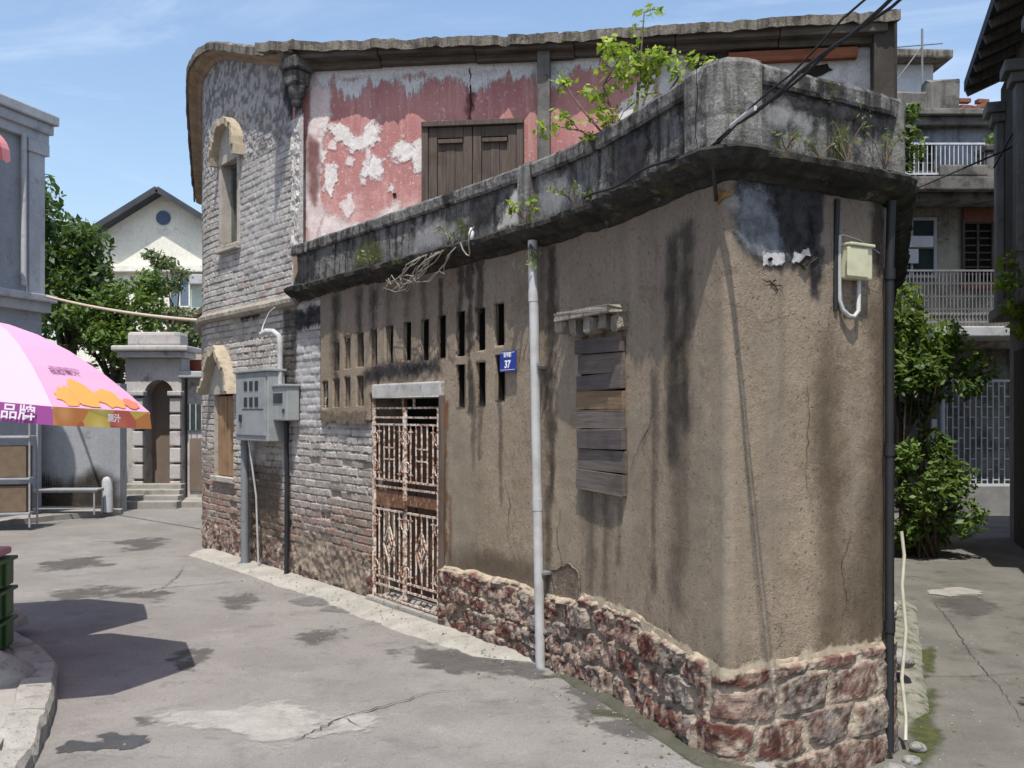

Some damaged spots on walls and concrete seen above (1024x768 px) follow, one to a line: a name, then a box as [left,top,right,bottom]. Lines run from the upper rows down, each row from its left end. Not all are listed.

crack [467,68,475,120]
peeling [551,40,706,122]
peeling [303,62,537,241]
water stain [415,222,457,251]
water stain [470,191,518,230]
water stain [541,179,583,217]
water stain [730,180,825,296]
spalling [799,250,820,270]
water stain [665,227,692,457]
spalling [550,562,694,656]